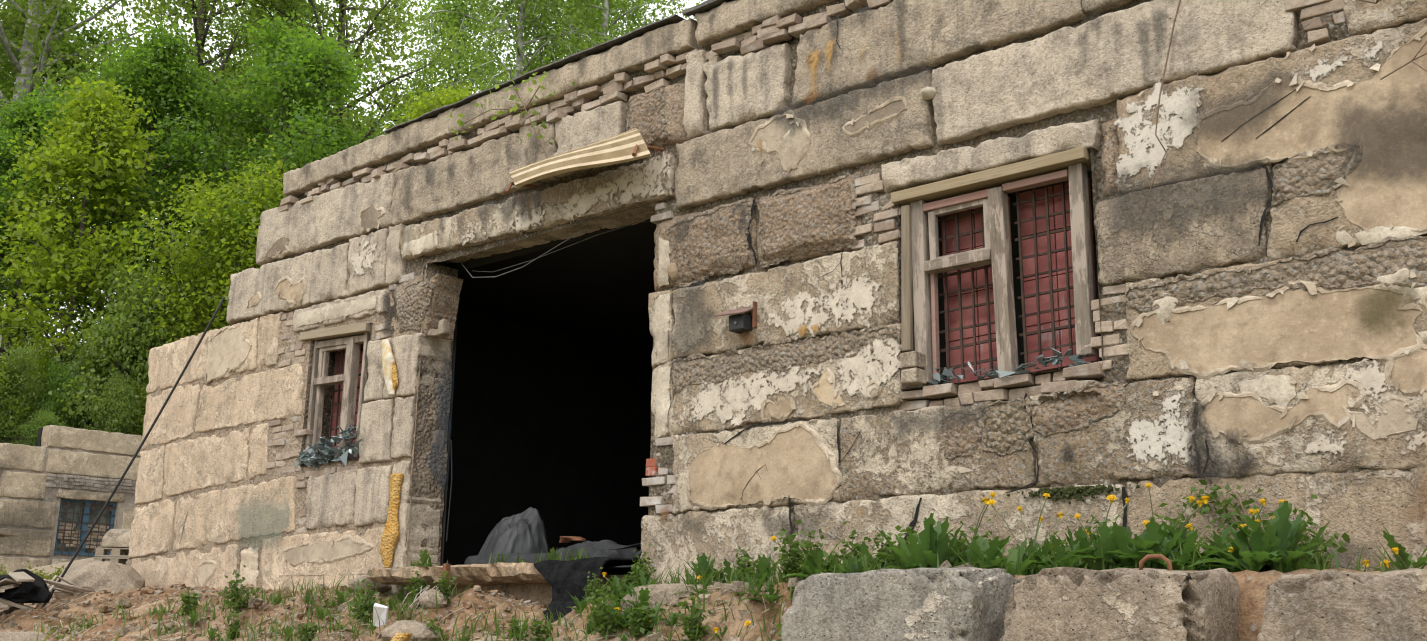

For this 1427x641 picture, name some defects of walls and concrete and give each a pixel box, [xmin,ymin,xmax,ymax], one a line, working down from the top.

peeling [742,110,811,171]
peeling [843,96,907,137]
crack [1221,89,1311,245]
peeling [942,26,1427,475]
crack [1296,217,1338,242]
peeling [653,173,905,510]
crack [903,497,922,541]